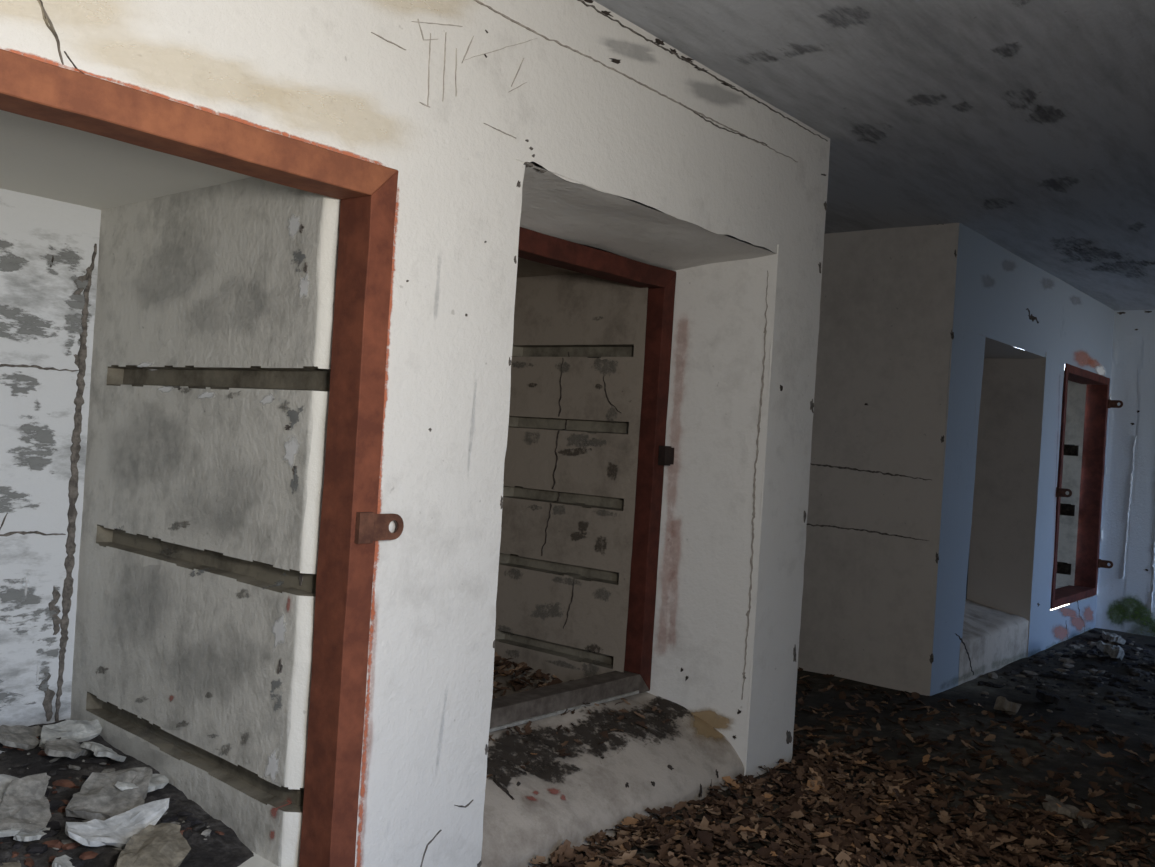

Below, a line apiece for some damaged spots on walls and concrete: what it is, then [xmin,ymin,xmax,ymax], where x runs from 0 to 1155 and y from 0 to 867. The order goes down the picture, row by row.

crack [37,0,84,74]
crack [474,0,797,162]
peeling [0,240,97,722]